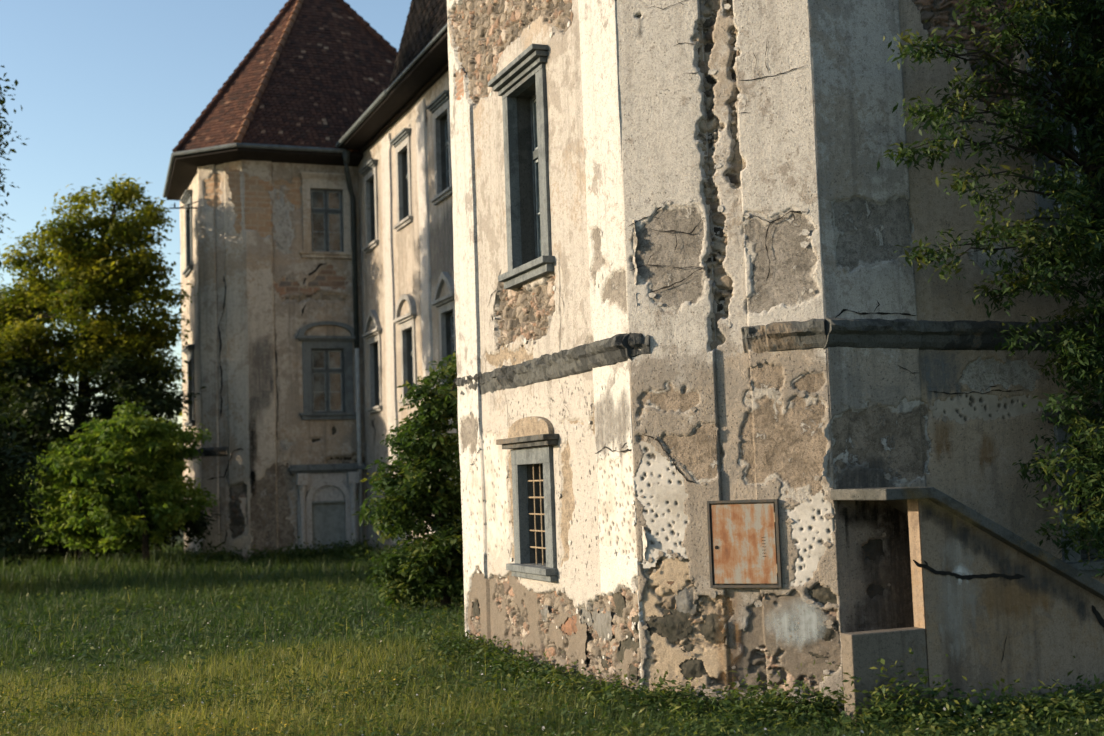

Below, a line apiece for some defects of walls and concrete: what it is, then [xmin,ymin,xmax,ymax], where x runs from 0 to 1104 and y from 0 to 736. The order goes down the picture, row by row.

flaking render [430,0,574,104]
flaking render [912,0,1020,116]
peeling [590,0,746,350]
peeling [743,208,821,314]
peeling [830,196,914,272]
flaking render [480,275,556,368]
leakage [249,341,273,489]
leakage [836,460,892,489]
flaking render [467,453,841,700]
leakage [840,502,914,632]
crack [913,560,1025,580]
crack [1092,605,1104,627]